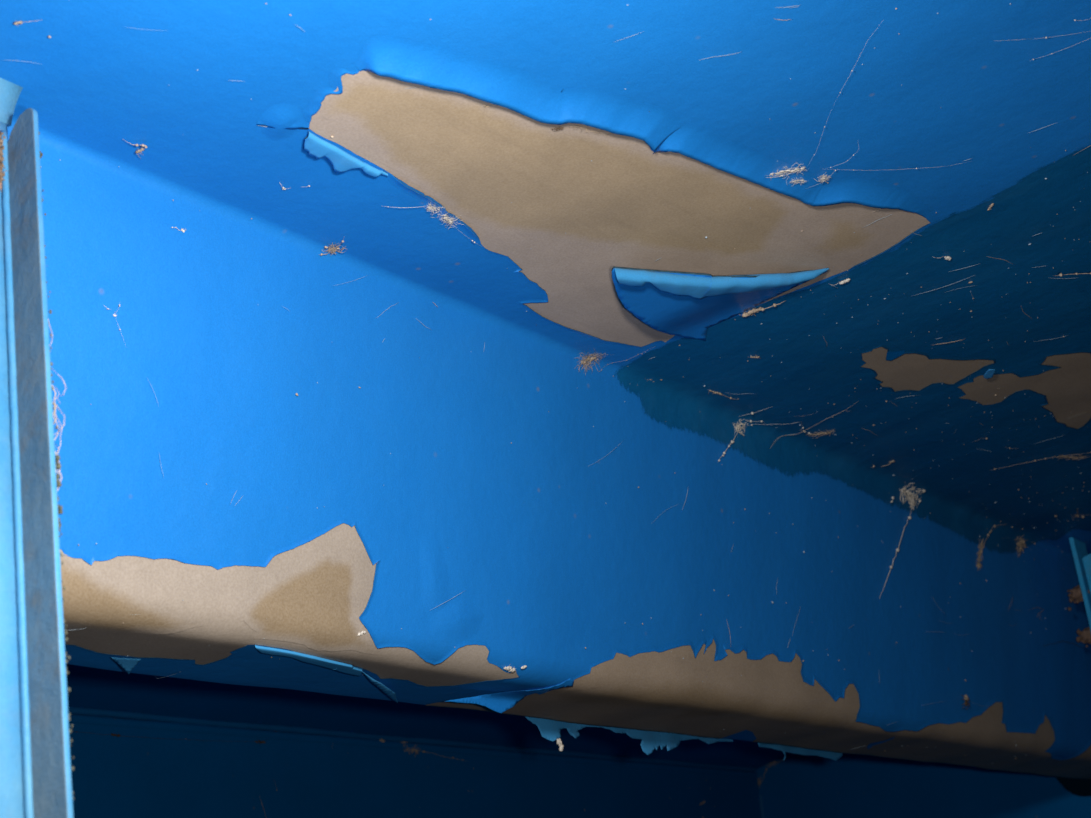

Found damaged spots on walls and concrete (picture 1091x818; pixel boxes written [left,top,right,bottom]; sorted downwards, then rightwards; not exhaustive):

peeling [302,36,940,348]
peeling [859,346,1091,429]
peeling [60,518,1091,780]